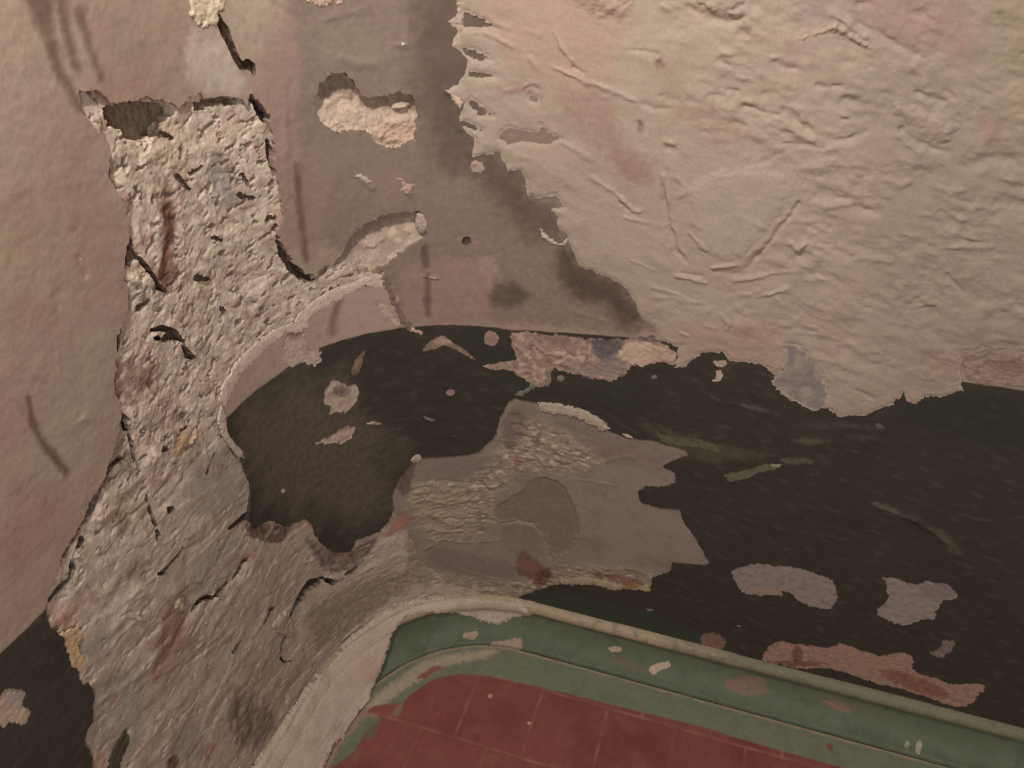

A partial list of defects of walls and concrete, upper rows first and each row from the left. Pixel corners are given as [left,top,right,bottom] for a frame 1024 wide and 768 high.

flaking render [189,0,225,28]
flaking render [313,72,418,148]
leakage [562,252,638,321]
flaking render [45,91,721,768]
peeling [731,563,839,609]
peeling [877,577,958,625]
peeling [762,640,986,707]